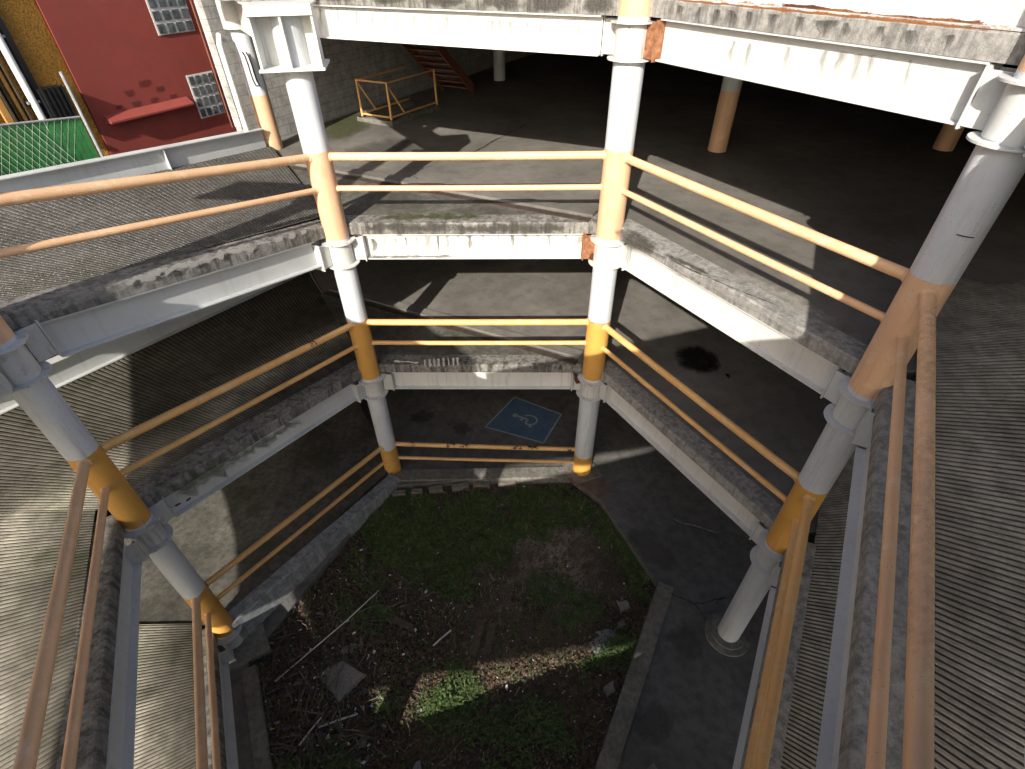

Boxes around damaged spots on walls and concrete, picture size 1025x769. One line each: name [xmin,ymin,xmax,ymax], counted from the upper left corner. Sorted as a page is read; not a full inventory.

leakage [426,0,462,19]
leakage [485,0,516,9]
leakage [534,0,568,11]
leakage [585,0,609,11]
rust [678,0,987,31]